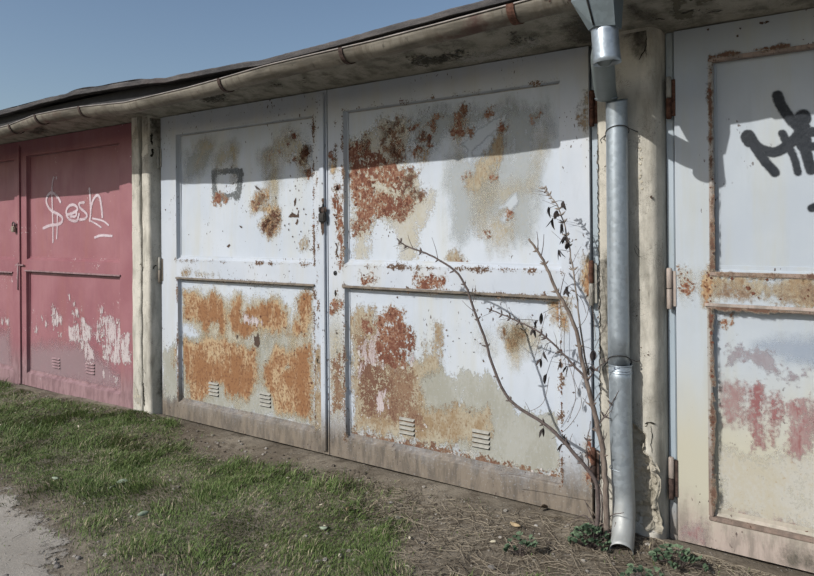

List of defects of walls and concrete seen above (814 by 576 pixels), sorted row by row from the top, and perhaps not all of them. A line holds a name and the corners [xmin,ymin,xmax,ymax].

rust [251,130,312,238]
rust [319,113,447,290]
rust [449,101,475,145]
rust [461,106,508,195]
rust [706,51,741,146]
rust [446,249,468,262]
peeling [34,293,132,386]
rust [171,287,494,450]
rust [501,325,539,359]
rust [676,156,814,509]
spalling [632,422,664,534]